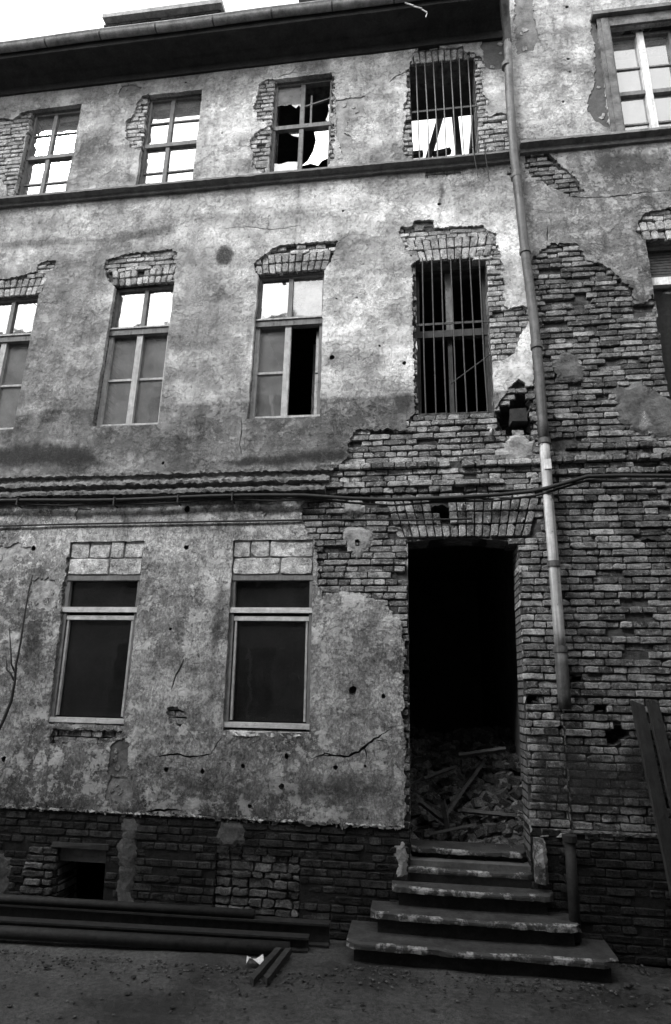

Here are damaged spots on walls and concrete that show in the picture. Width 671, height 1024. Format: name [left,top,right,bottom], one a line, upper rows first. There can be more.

flaking render [402,0,538,159]
flaking render [587,22,610,129]
flaking render [250,81,280,173]
flaking render [0,113,44,196]
flaking render [525,156,585,197]
flaking render [636,210,671,243]
flaking render [0,261,56,299]
flaking render [105,251,177,288]
flaking render [255,242,336,277]
flaking render [300,223,671,841]
crack [159,744,217,758]
crack [312,730,389,762]